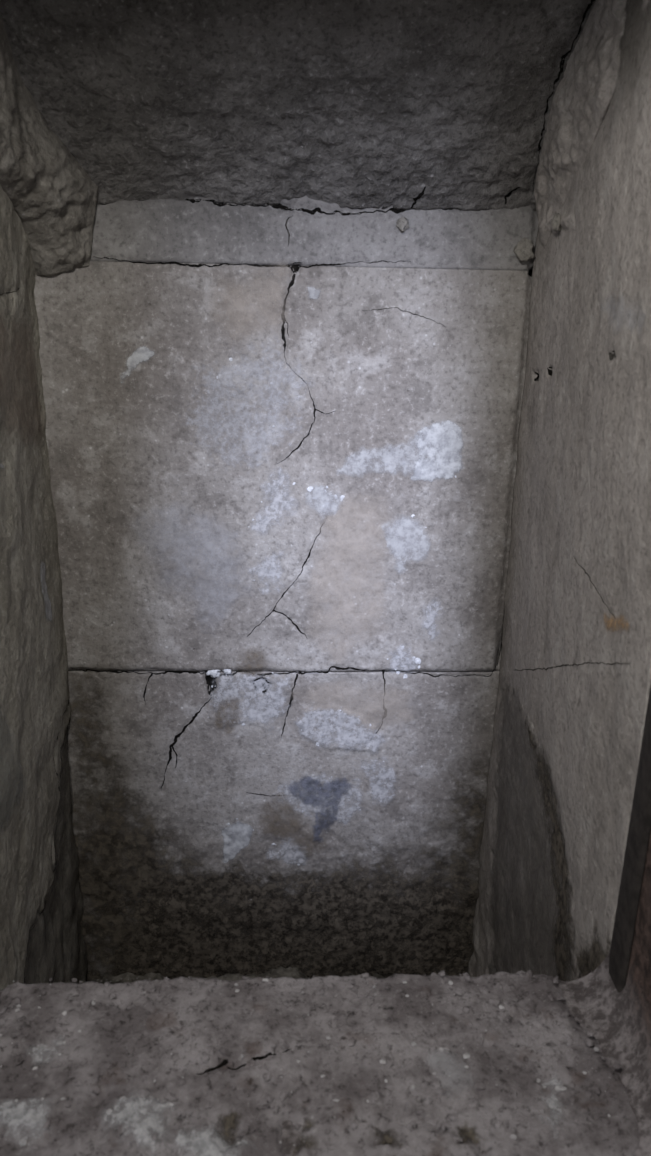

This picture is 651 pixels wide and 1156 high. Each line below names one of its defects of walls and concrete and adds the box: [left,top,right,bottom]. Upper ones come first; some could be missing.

crack [96,0,595,464]
crack [247,520,326,638]
crack [573,556,616,620]
crack [76,653,630,788]
water stain [291,777,348,840]